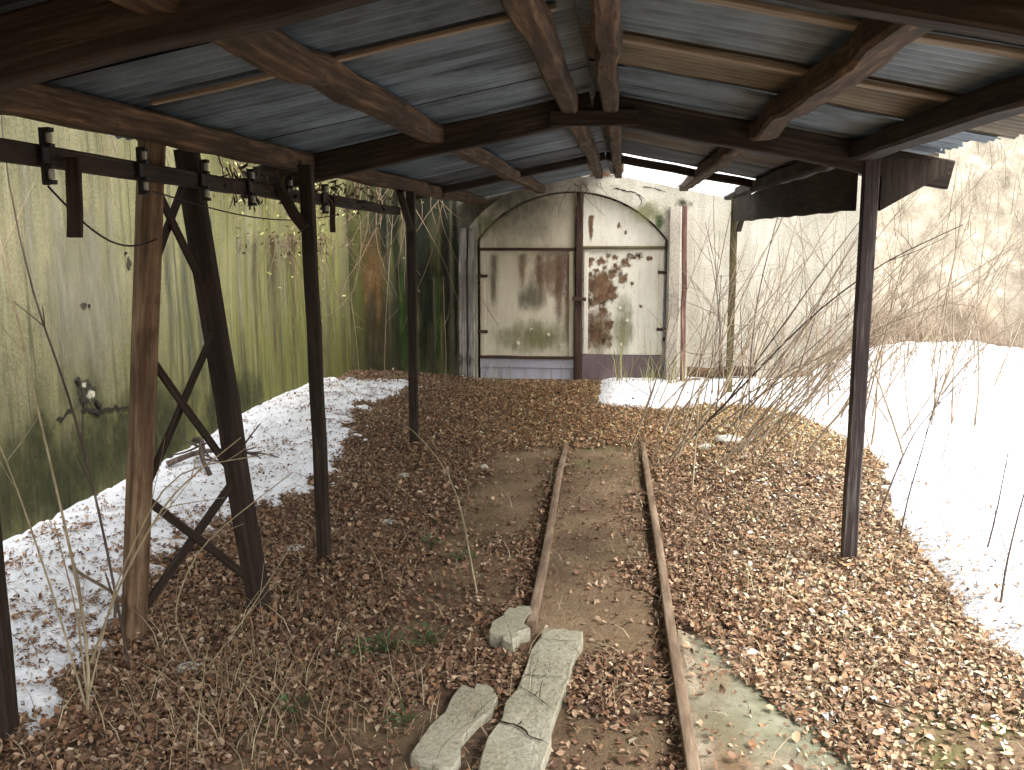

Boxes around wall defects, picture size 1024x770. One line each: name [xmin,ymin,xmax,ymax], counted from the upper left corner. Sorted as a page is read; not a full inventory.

leakage [271,243,295,348]
leakage [352,190,404,356]
leakage [416,196,525,358]
rust [520,255,575,330]
rust [582,252,653,349]
leakage [237,382,259,413]
crack [497,719,545,742]
crack [515,674,557,709]